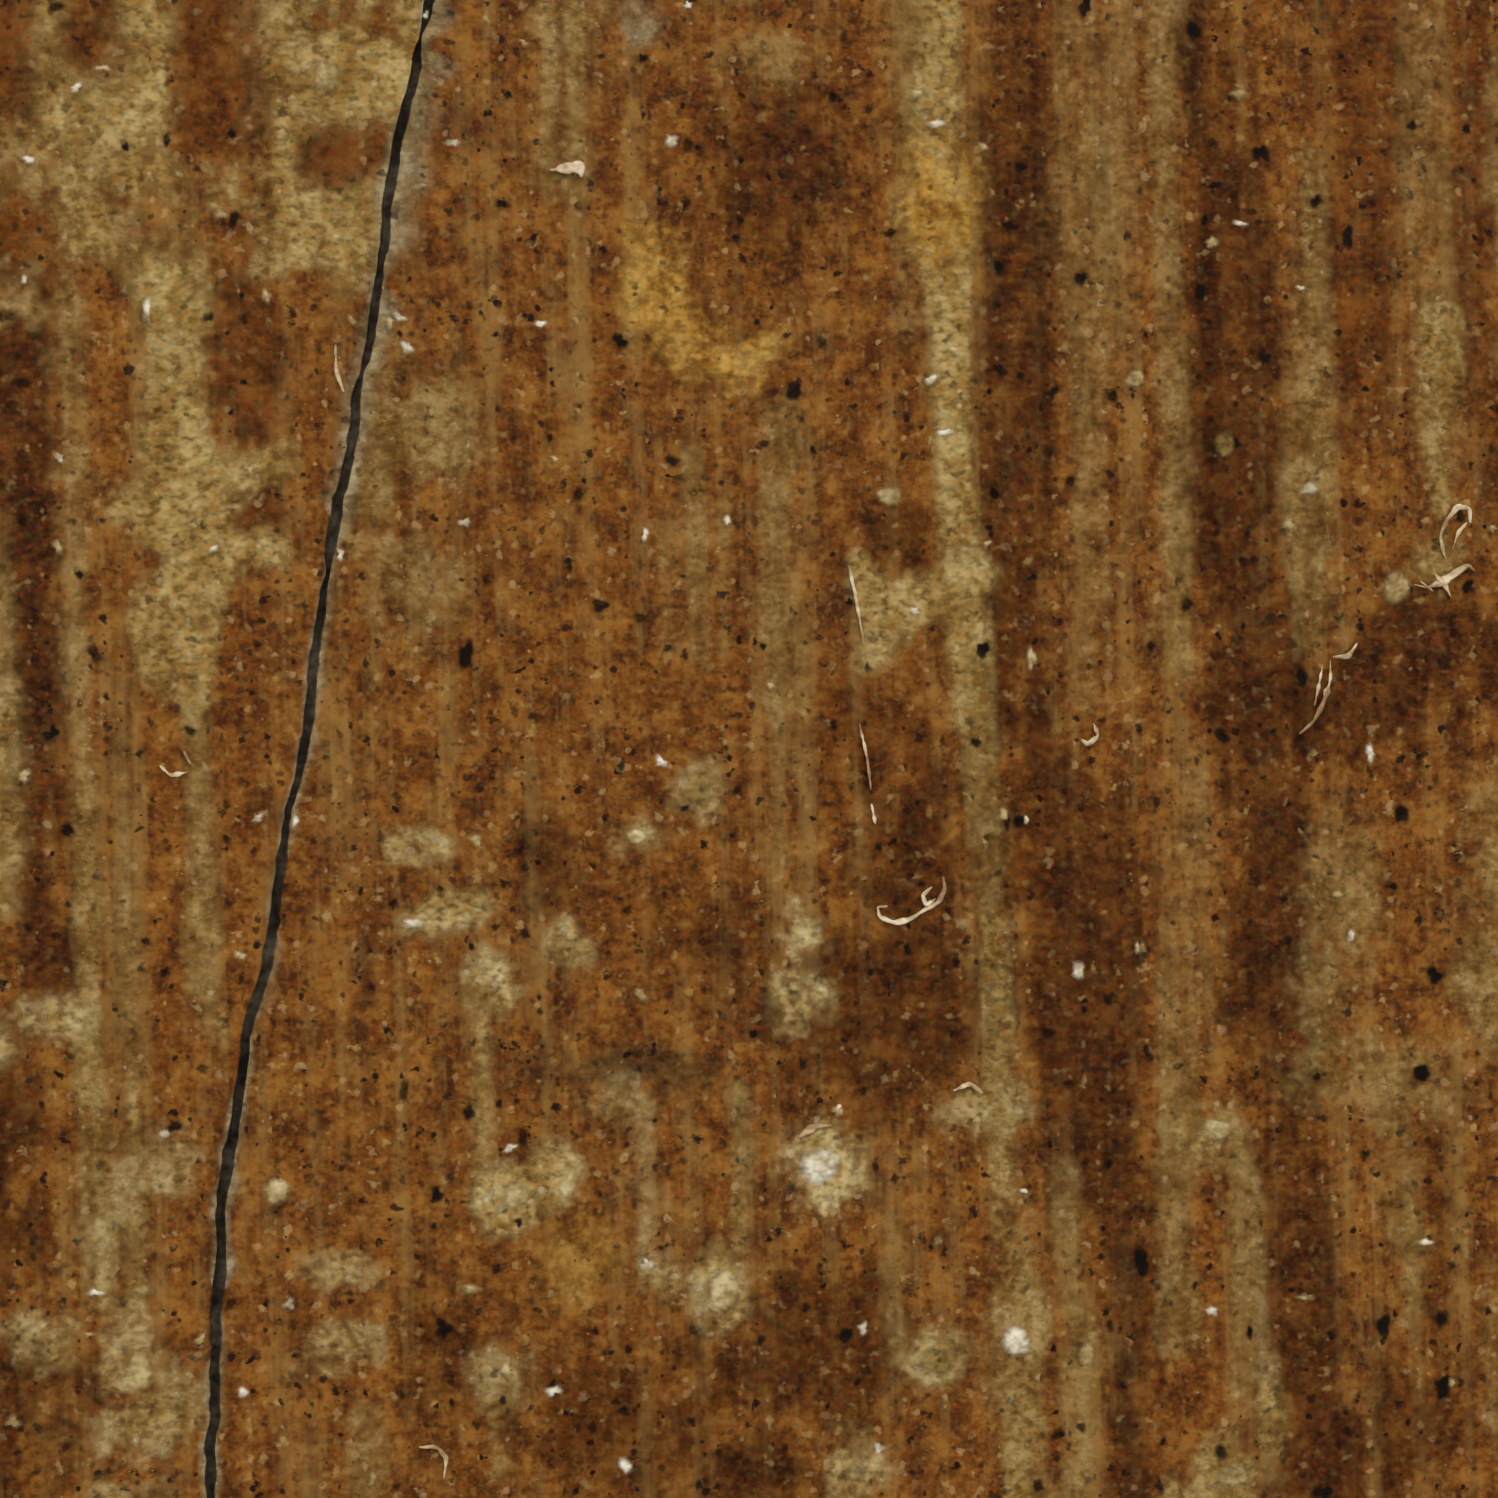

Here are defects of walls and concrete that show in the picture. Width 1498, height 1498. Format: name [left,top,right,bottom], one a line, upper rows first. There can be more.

corrosion [1177,66,1498,767]
leakage [0,644,23,914]
corrosion [0,261,81,1000]
crack [201,0,444,1498]
peeling [877,877,946,925]
corrosion [1008,703,1143,1216]
peeling [1297,643,1358,734]
leakage [639,1216,677,1298]
leakage [986,1120,1050,1498]